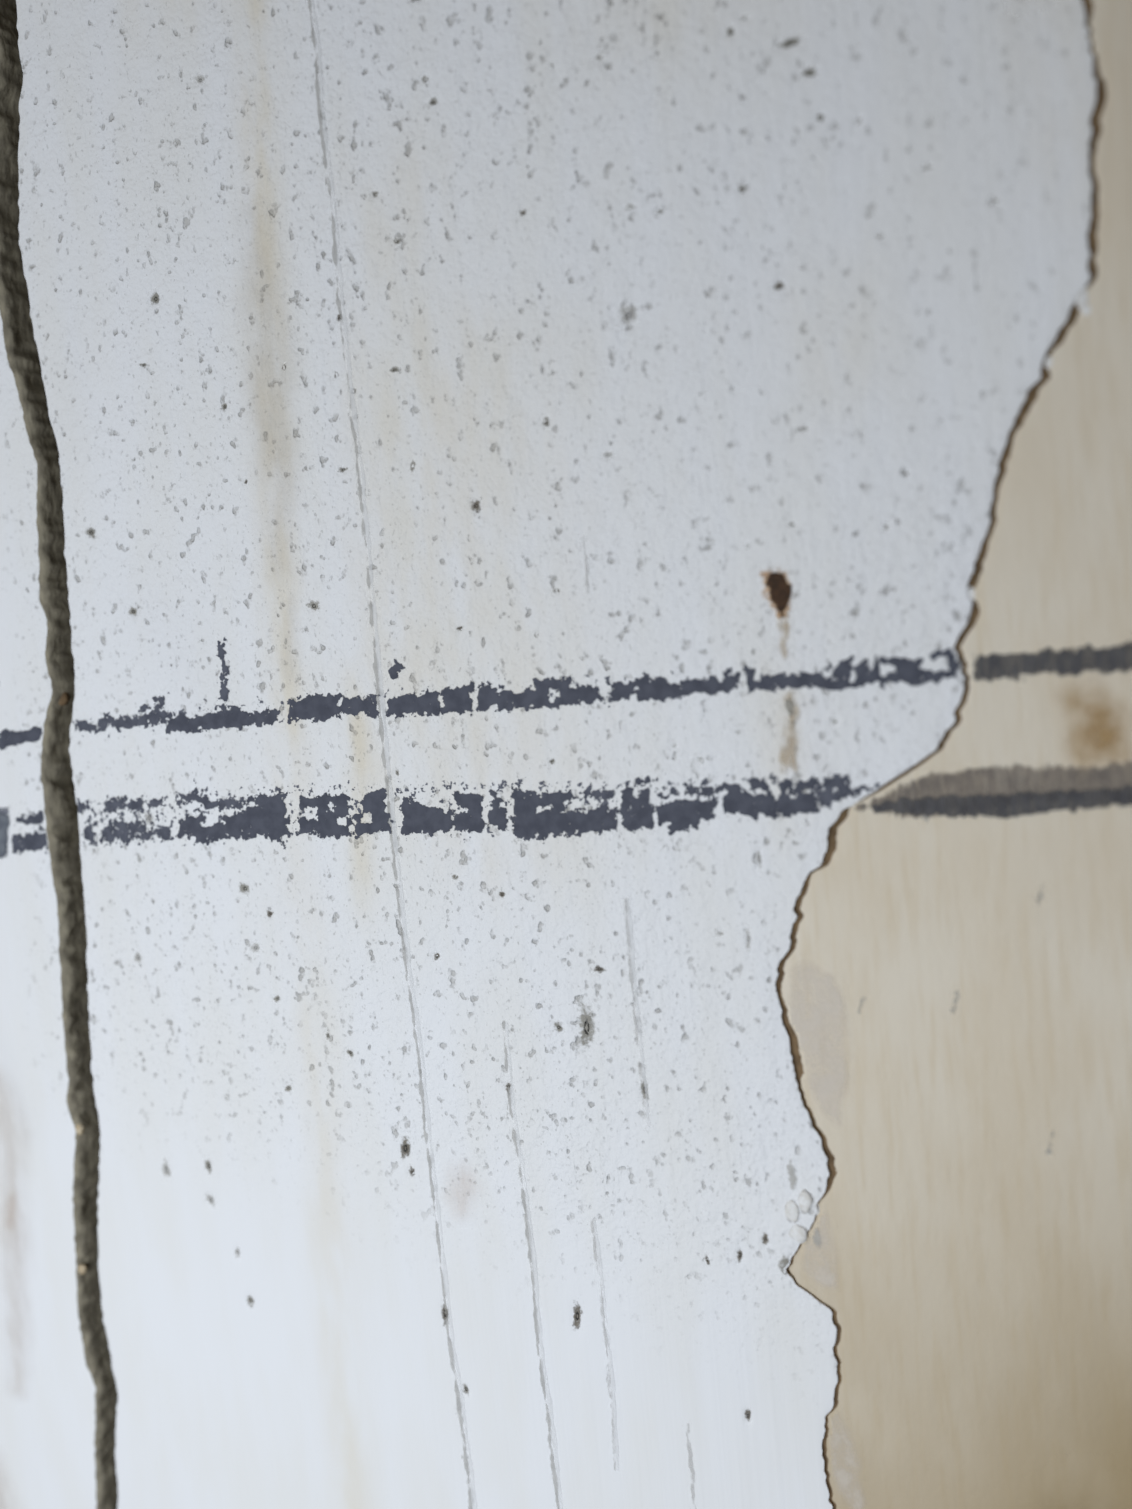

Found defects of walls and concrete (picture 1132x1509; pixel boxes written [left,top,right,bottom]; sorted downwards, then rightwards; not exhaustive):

crack [0,0,118,1509]
rust [761,572,791,618]
peeling [779,0,1132,1509]